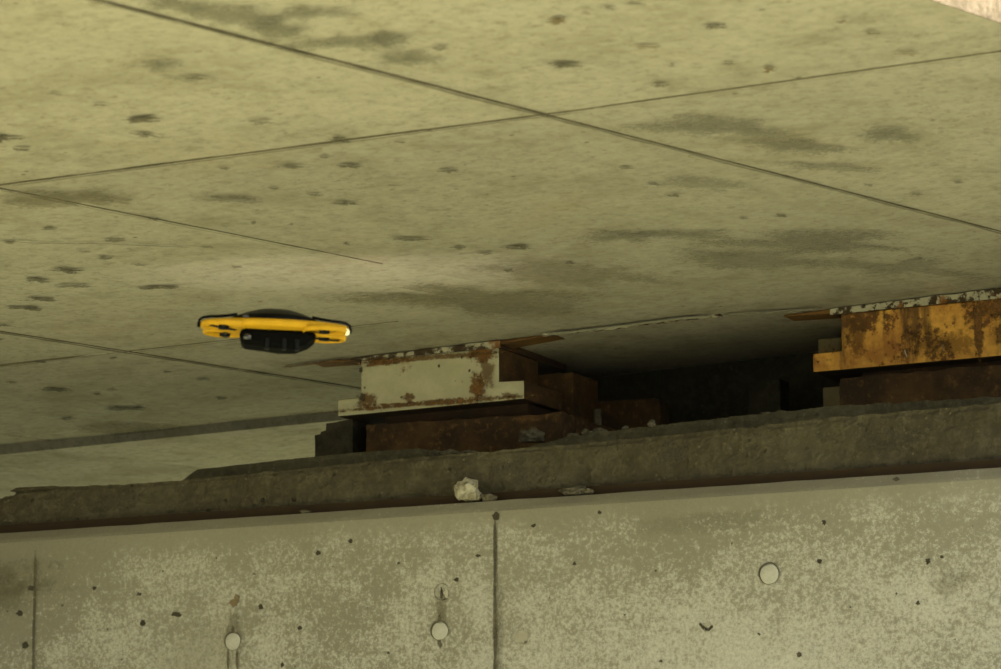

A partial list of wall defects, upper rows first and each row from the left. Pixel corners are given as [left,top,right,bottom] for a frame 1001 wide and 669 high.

corrosion [963,299,1001,367]
corrosion [286,349,541,412]